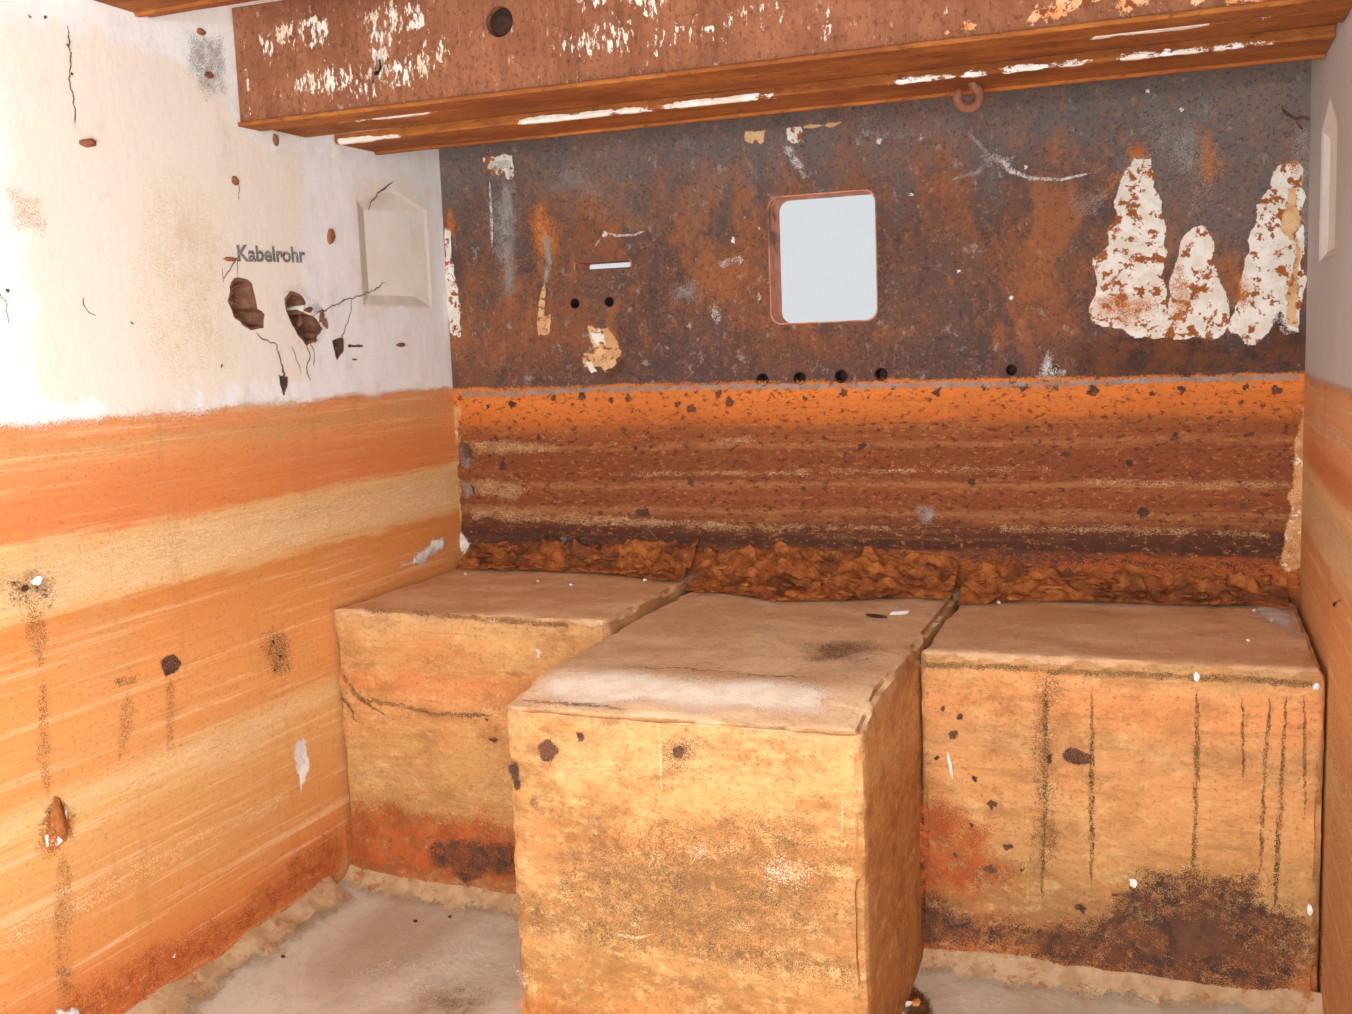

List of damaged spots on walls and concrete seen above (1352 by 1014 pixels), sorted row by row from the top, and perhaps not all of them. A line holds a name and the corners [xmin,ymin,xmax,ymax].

rust [1026,0,1150,26]
damp [485,177,525,306]
damp [542,230,552,287]
peeling [1088,136,1307,353]
spalling [228,277,265,330]
spalling [283,283,328,350]
crack [256,282,384,395]
rust [537,285,551,335]
rust [1066,331,1305,389]
rust [0,570,65,668]
crack [340,671,491,722]
damp [0,351,1352,1014]